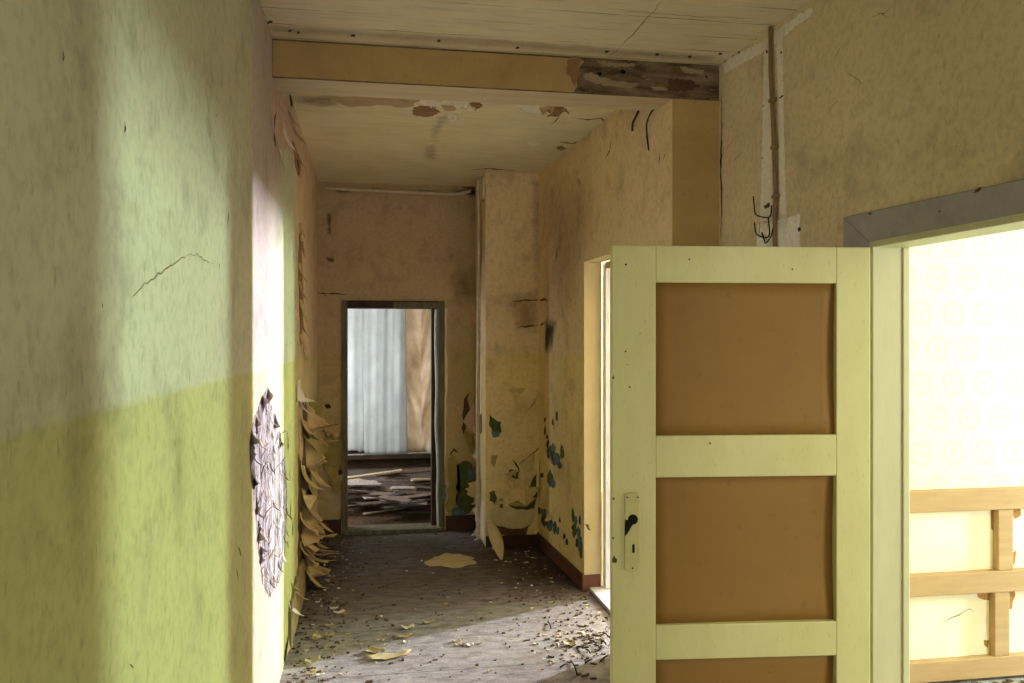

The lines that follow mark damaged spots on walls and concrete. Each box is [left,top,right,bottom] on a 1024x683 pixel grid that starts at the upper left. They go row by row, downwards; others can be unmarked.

peeling [583,60,704,92]
peeling [270,91,306,177]
peeling [412,100,482,123]
peeling [540,106,569,124]
crack [135,253,212,295]
peeling [442,308,590,559]
spalling [249,379,342,660]